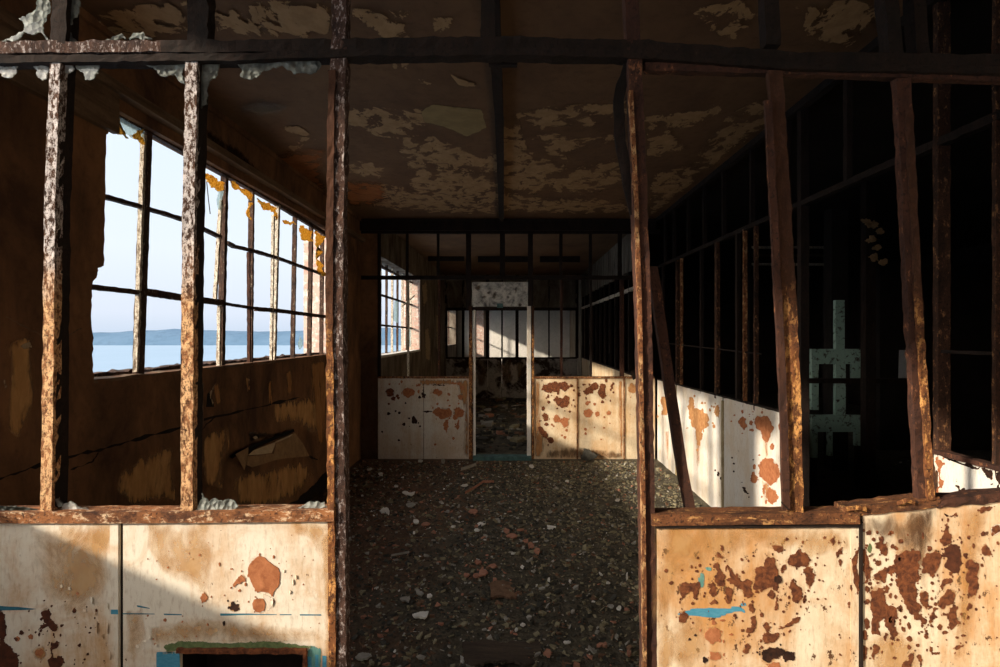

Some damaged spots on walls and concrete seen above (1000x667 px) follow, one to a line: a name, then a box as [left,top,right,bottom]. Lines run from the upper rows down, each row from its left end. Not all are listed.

peeling [694,0,758,40]
peeling [796,0,875,47]
peeling [348,100,629,214]
crack [0,462,41,480]
crack [69,397,299,470]
rust [385,380,468,454]
rust [535,378,636,458]
rust [686,395,720,461]
rust [731,409,780,505]
rust [218,548,292,613]
rust [661,506,1000,667]
rust [0,600,89,667]